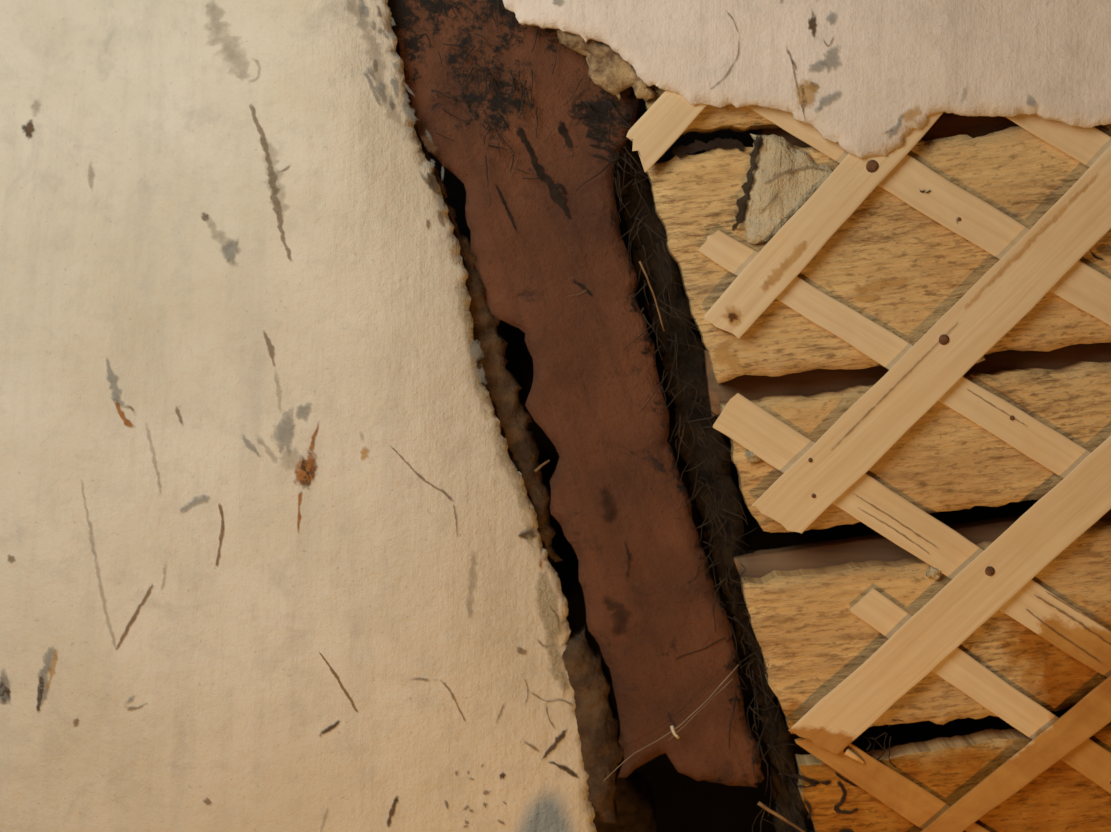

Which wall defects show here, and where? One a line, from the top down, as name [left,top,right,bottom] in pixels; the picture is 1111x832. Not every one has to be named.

spalling [358,0,395,39]
spalling [808,12,835,36]
spalling [365,60,416,119]
spalling [797,48,840,110]
spalling [886,108,921,137]
spalling [421,131,445,228]
rust [295,425,318,529]
spalling [519,528,537,543]
spalling [538,559,568,688]